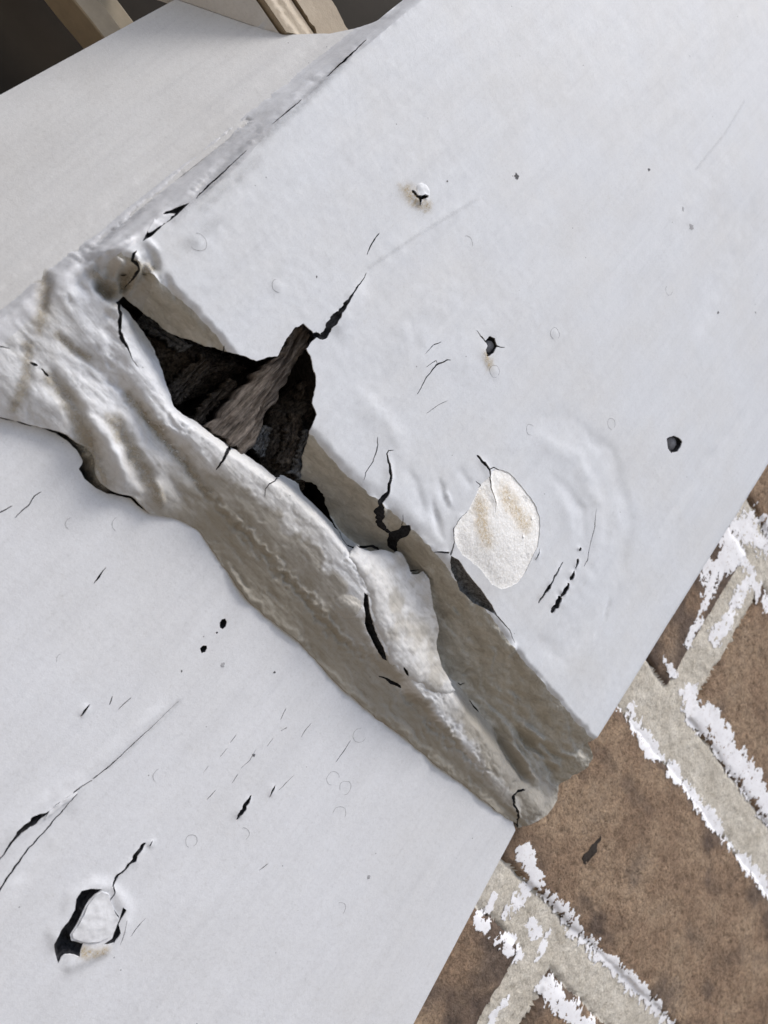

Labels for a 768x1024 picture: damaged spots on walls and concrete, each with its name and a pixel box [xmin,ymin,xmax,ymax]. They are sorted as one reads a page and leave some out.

crack [327,40,366,76]
spalling [118,297,146,316]
crack [313,233,379,340]
spalling [175,347,273,425]
spalling [278,325,316,429]
spalling [302,482,337,529]
crack [339,438,415,571]
peeling [454,469,540,589]
crack [537,523,595,613]
crack [363,593,408,688]
crack [0,710,169,890]
spalling [54,889,126,962]